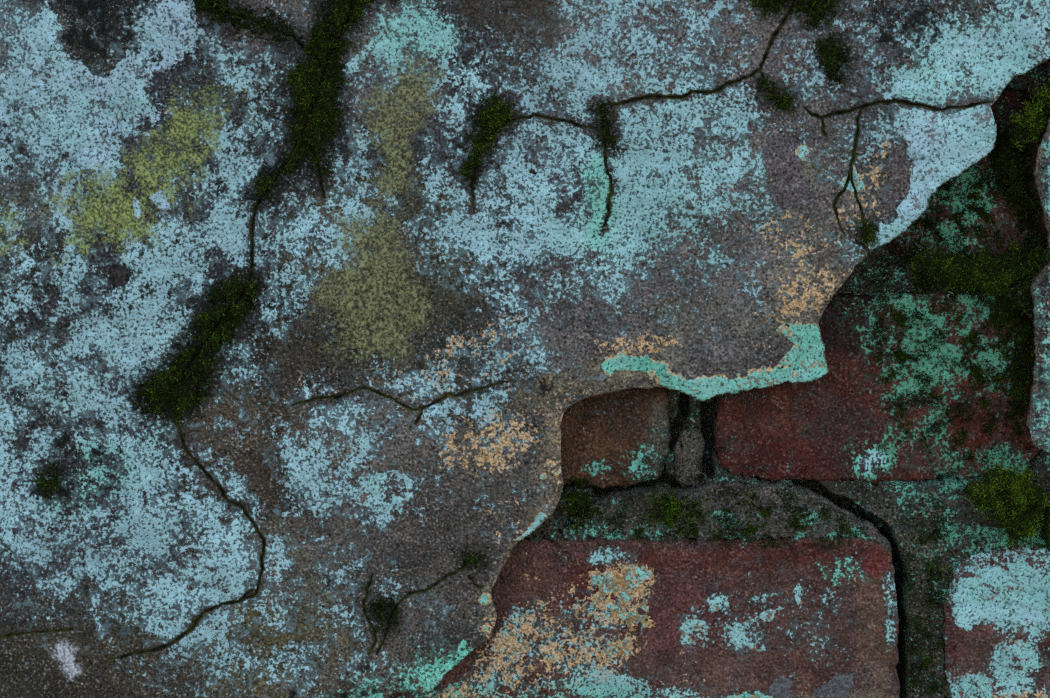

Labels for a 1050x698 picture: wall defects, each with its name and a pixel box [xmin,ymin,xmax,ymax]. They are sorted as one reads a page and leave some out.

leakage [366,60,443,198]
crack [469,0,993,236]
leakage [52,94,229,253]
spalling [871,143,915,220]
crack [101,0,353,664]
leakage [274,215,431,376]
peeling [602,321,828,400]
crack [291,379,514,425]
peeling [515,499,560,546]
crack [0,626,77,640]
peeling [420,639,473,693]
peeling [478,591,497,633]